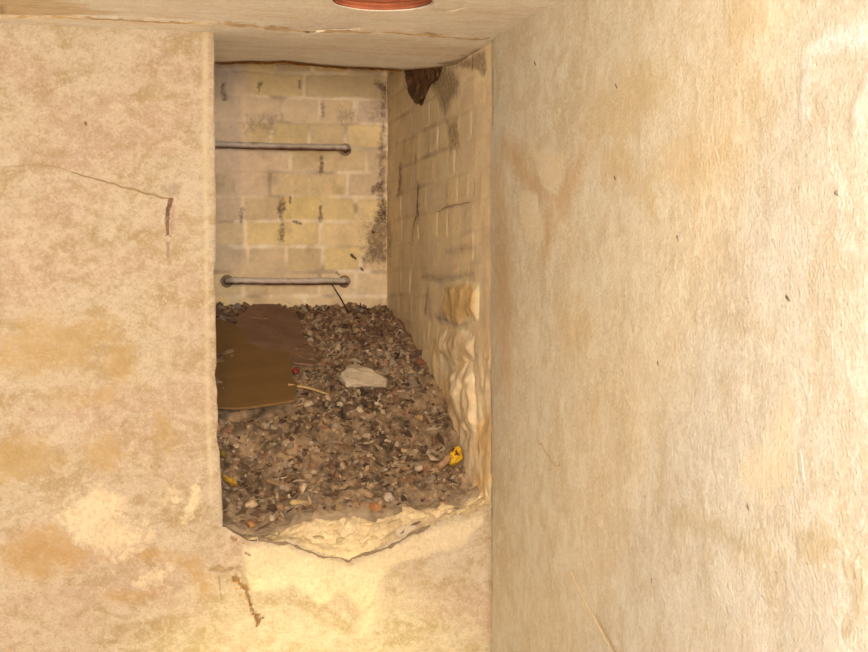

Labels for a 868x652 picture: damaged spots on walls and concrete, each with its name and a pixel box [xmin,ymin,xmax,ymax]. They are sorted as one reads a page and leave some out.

spalling [404,67,442,106]
leakage [433,50,485,109]
crack [5,164,168,199]
corrosion [165,186,177,255]
leakage [351,145,387,271]
corrosion [210,565,264,627]
peeling [223,492,489,645]